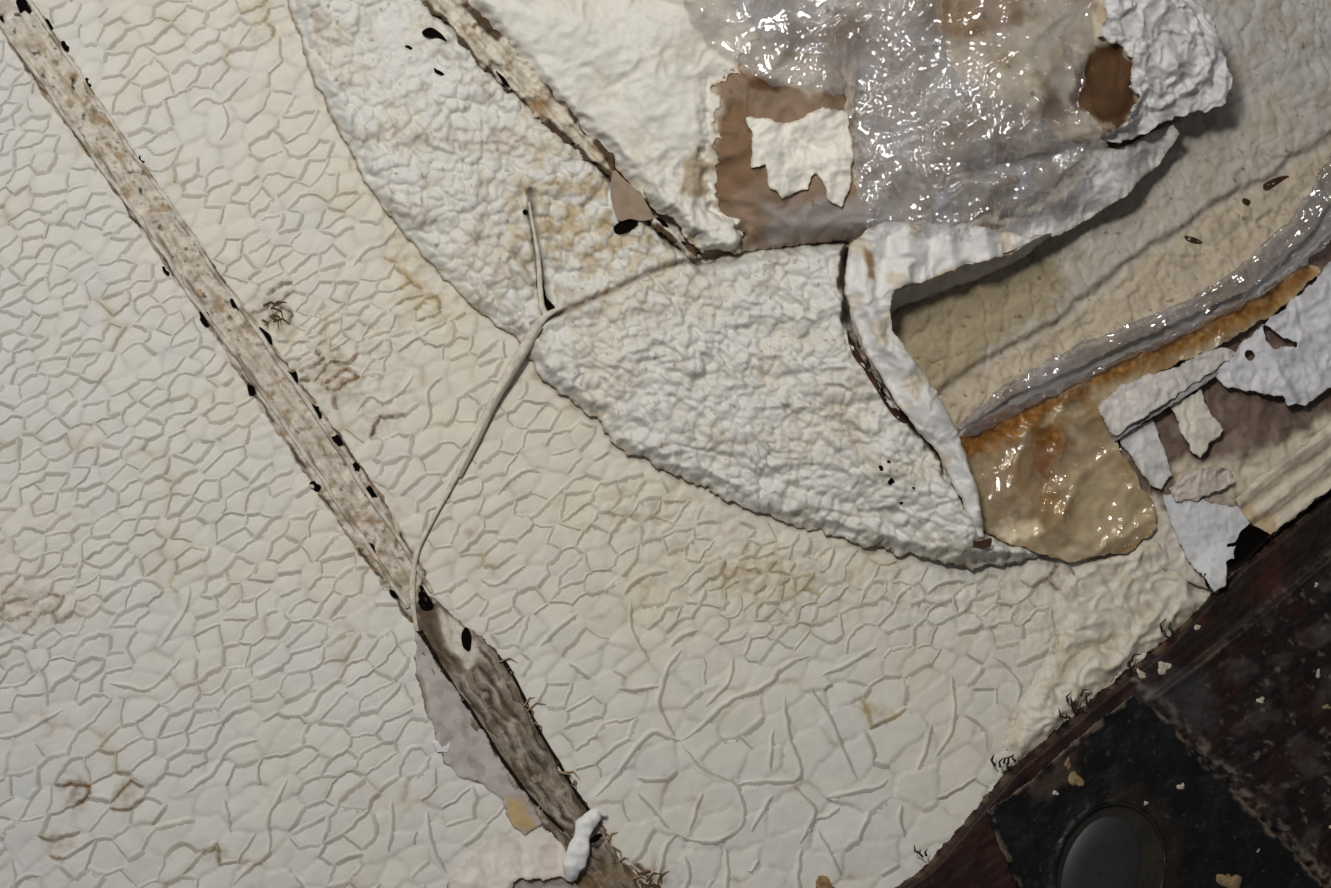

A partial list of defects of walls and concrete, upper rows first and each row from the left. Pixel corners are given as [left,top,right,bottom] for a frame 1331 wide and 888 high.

crack [0,0,1060,888]
peeling [1097,232,1331,593]
peeling [414,632,578,888]